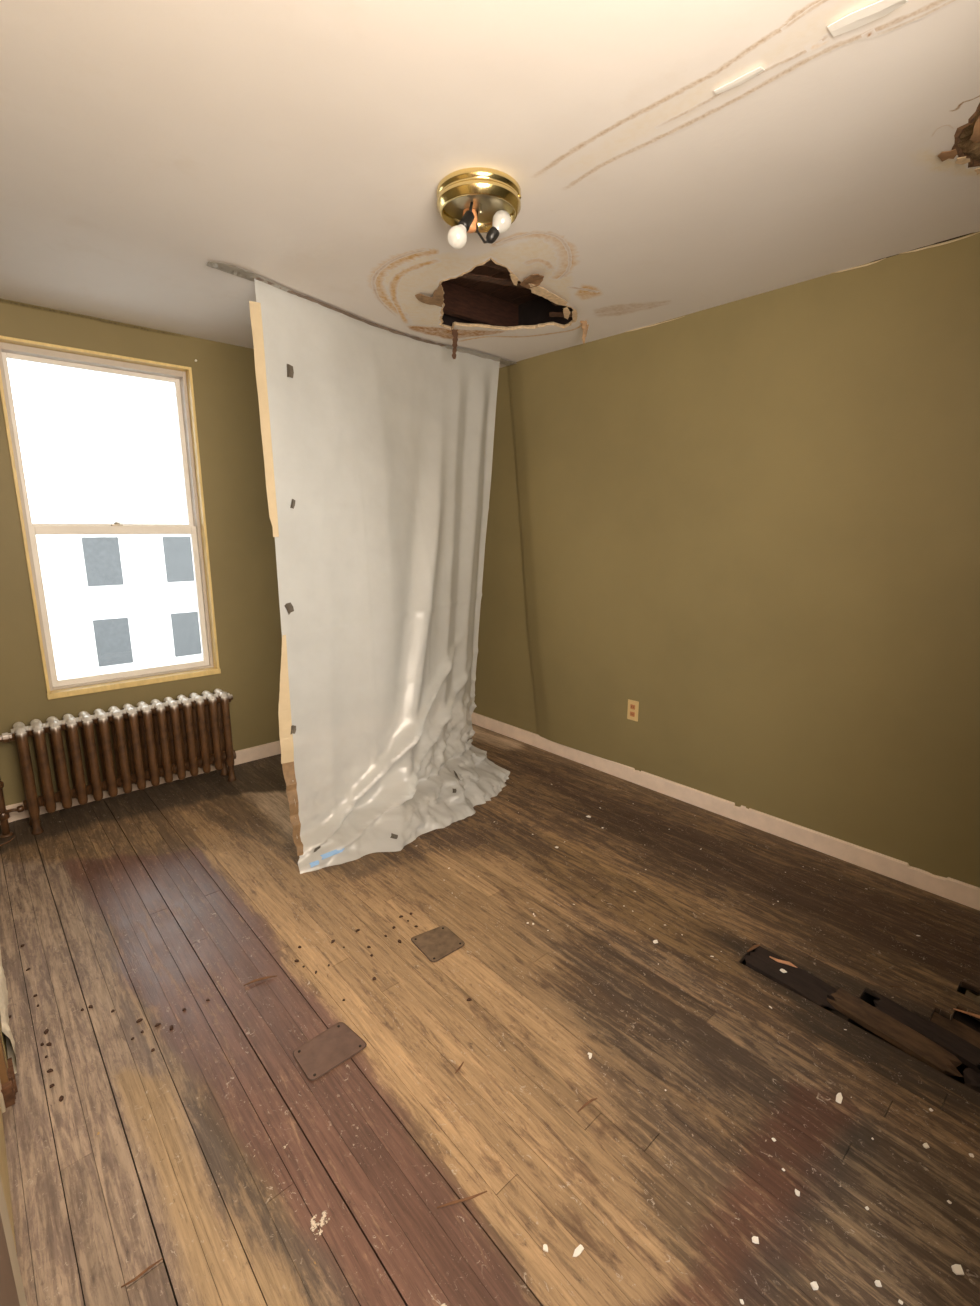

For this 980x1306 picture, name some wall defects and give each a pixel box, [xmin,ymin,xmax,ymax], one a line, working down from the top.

crack [529,0,957,192]
crack [900,95,980,181]
flaking render [938,103,980,175]
flaking render [415,258,589,359]
damp [366,230,675,343]